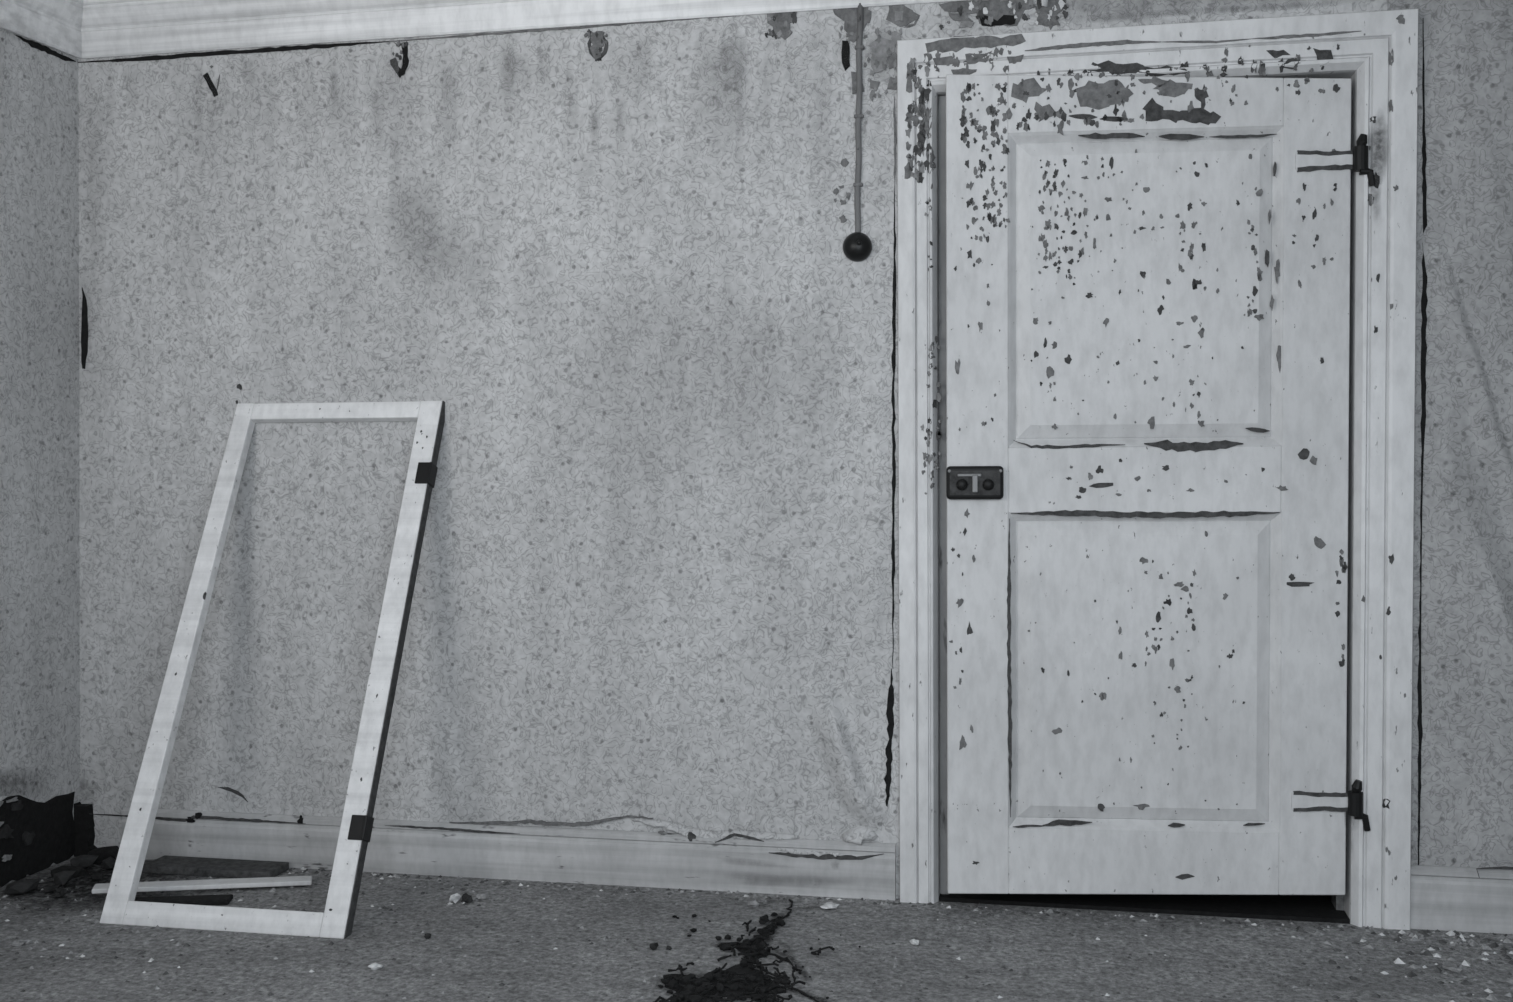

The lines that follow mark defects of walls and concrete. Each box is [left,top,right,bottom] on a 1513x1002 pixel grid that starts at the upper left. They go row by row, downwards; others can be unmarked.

flaking render [765,12,797,40]
peeling [833,0,1340,271]
peeling [1031,155,1219,348]
peeling [1236,162,1280,321]
peeling [1292,183,1337,288]
peeling [920,336,942,495]
peeling [1030,317,1072,401]
peeling [1066,459,1123,499]
peeling [1144,361,1218,429]
peeling [1298,448,1317,465]
peeling [1287,573,1314,587]
peeling [1116,557,1196,750]